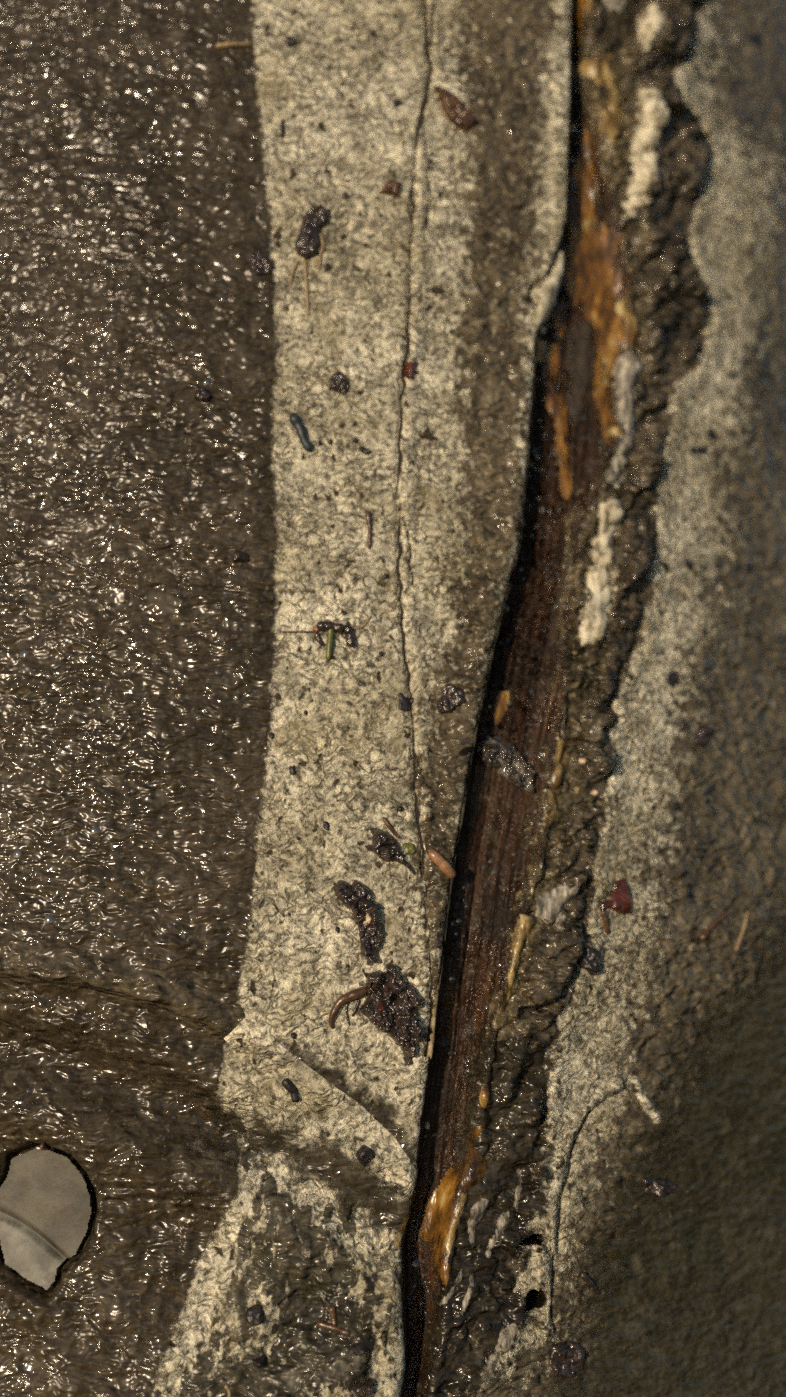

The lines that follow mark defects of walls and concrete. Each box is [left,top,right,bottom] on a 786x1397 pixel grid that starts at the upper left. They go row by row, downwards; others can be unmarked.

peeling [603,0,666,51]
peeling [621,80,670,220]
rust [533,0,637,499]
peeling [536,324,556,364]
peeling [579,352,642,646]
crack [395,0,643,1397]
peeling [535,885,580,930]
rust [479,1086,490,1108]
rust [420,1126,486,1285]